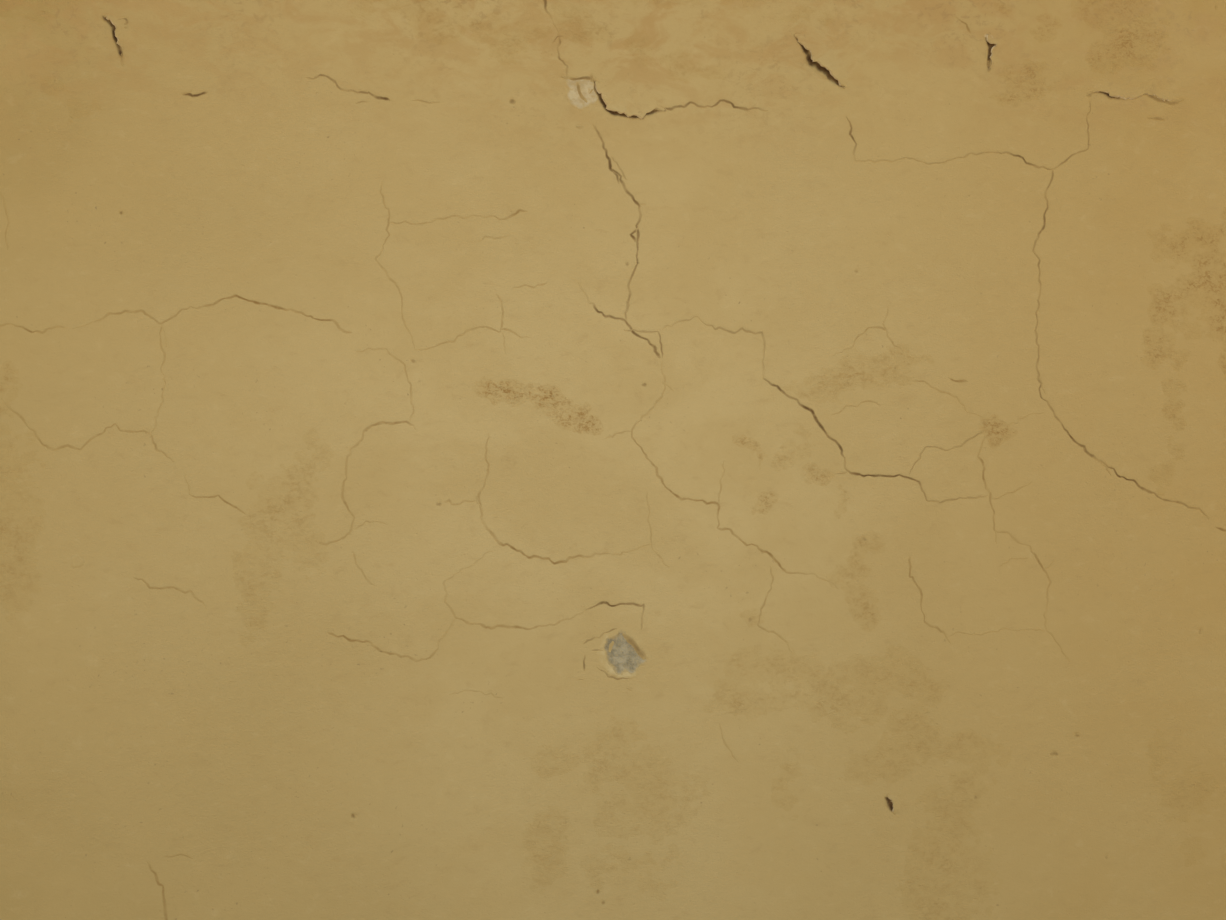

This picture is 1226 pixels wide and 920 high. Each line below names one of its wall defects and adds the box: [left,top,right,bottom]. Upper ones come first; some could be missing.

peeling [101,14,129,65]
peeling [793,31,857,89]
crack [182,90,208,98]
crack [306,74,440,104]
peeling [561,75,667,128]
crack [0,181,547,586]
crack [328,99,1226,691]
spalling [596,629,647,681]